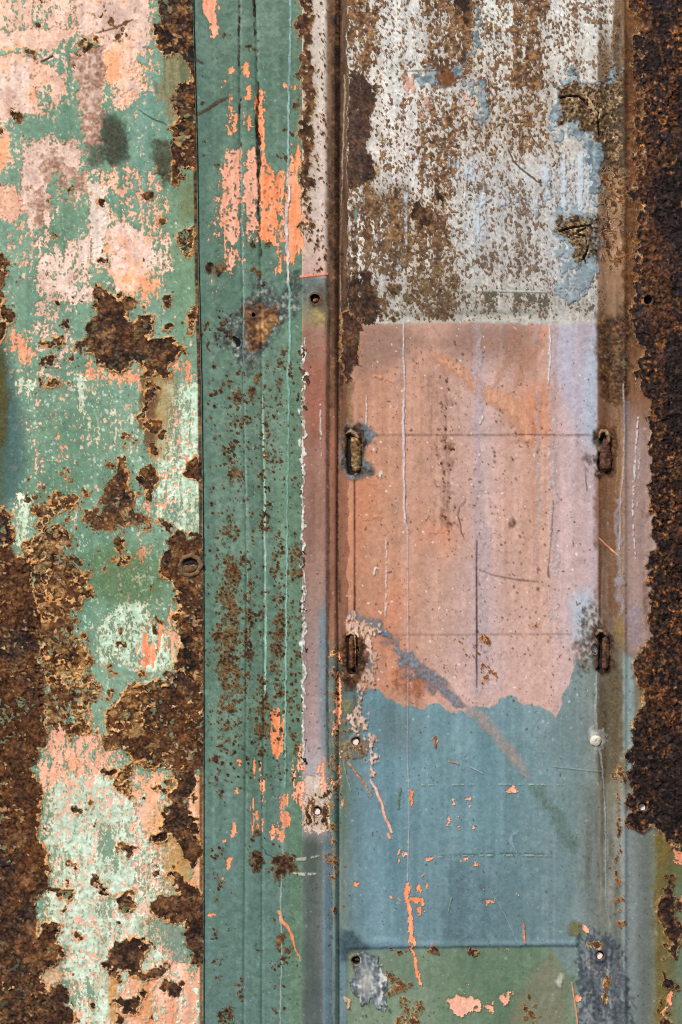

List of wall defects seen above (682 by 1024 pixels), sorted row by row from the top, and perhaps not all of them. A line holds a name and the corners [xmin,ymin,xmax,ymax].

peeling [0,0,199,553]
peeling [208,61,328,368]
rust [0,0,371,1024]
rust [282,0,682,1024]
peeling [36,709,203,1024]
peeling [344,951,390,1012]
peeling [389,874,428,985]